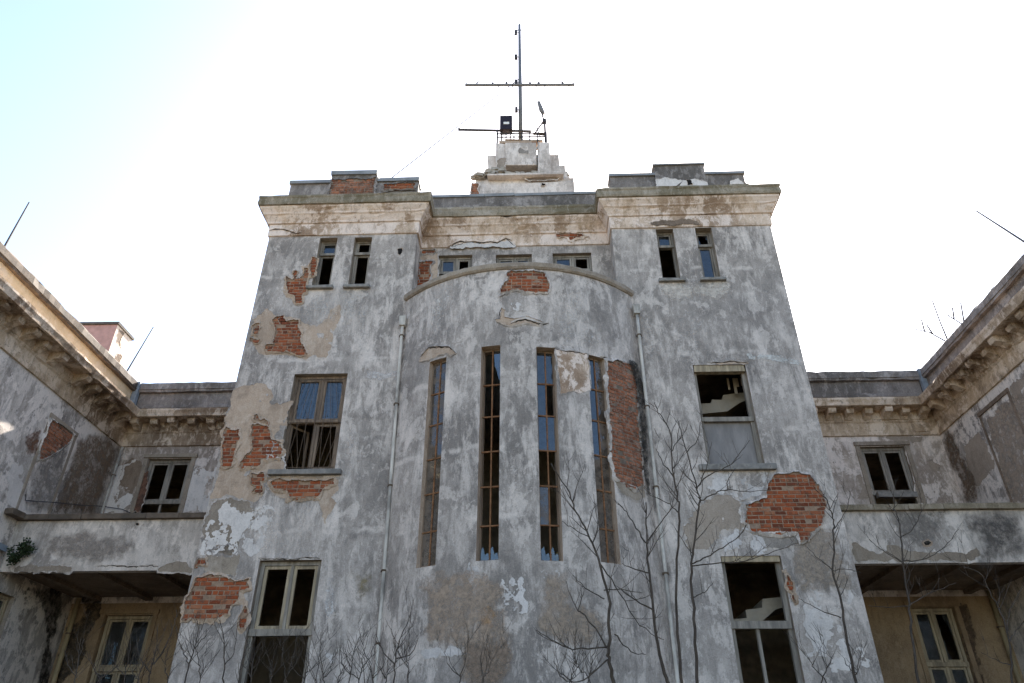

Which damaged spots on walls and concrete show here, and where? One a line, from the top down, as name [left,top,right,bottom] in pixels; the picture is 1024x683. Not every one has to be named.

flaking render [418,240,516,282]
flaking render [251,305,341,361]
flaking render [554,349,592,395]
flaking render [157,382,340,577]